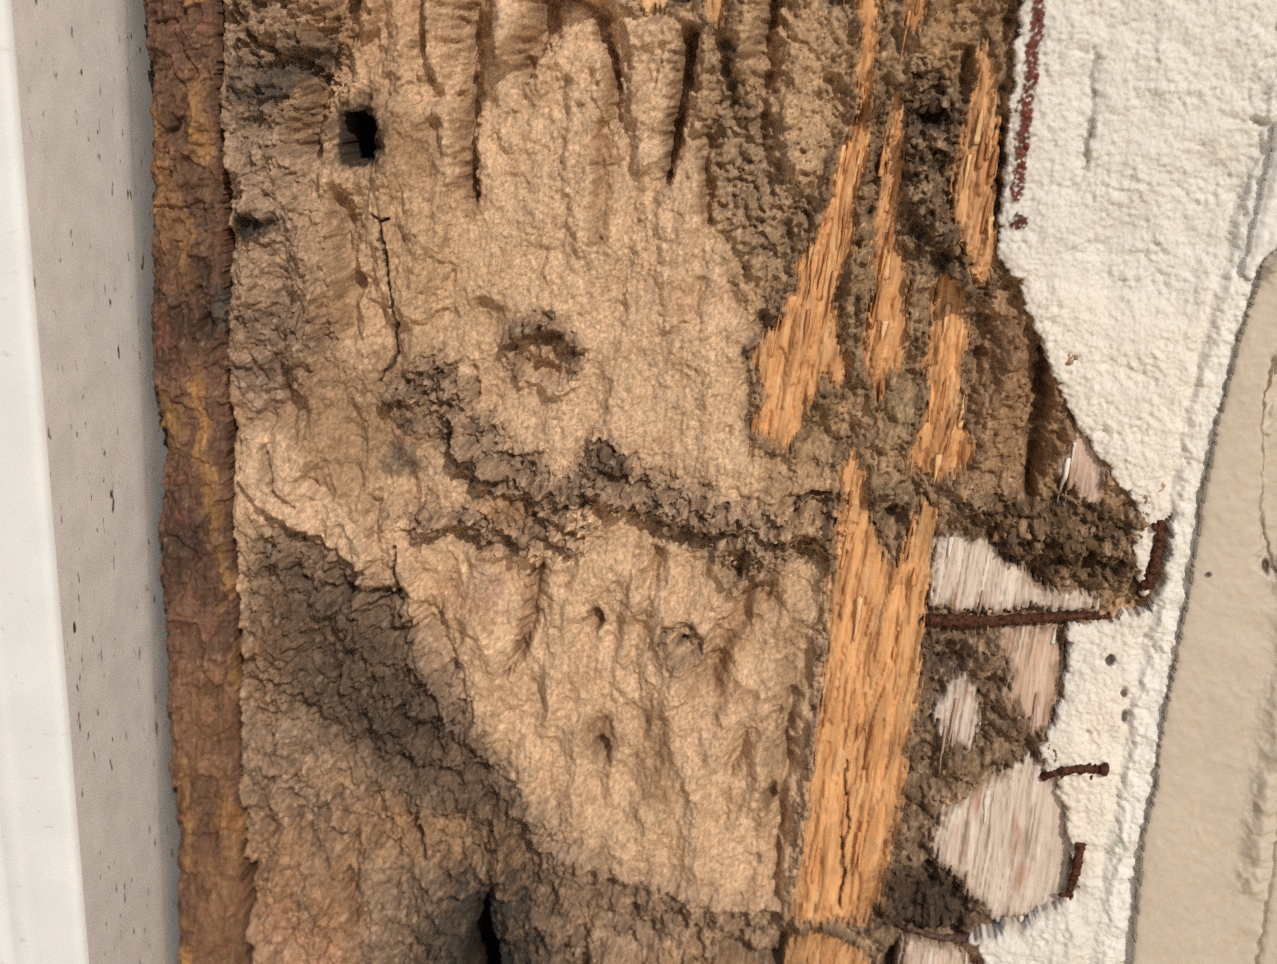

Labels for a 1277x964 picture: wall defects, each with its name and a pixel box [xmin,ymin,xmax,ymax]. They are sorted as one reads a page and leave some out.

peeling [912,95,950,127]
rust [1010,0,1046,230]
leakage [235,212,279,240]
peeling [1243,122,1277,280]
crack [376,217,401,381]
peeling [992,518,1102,562]
leakage [416,849,563,964]